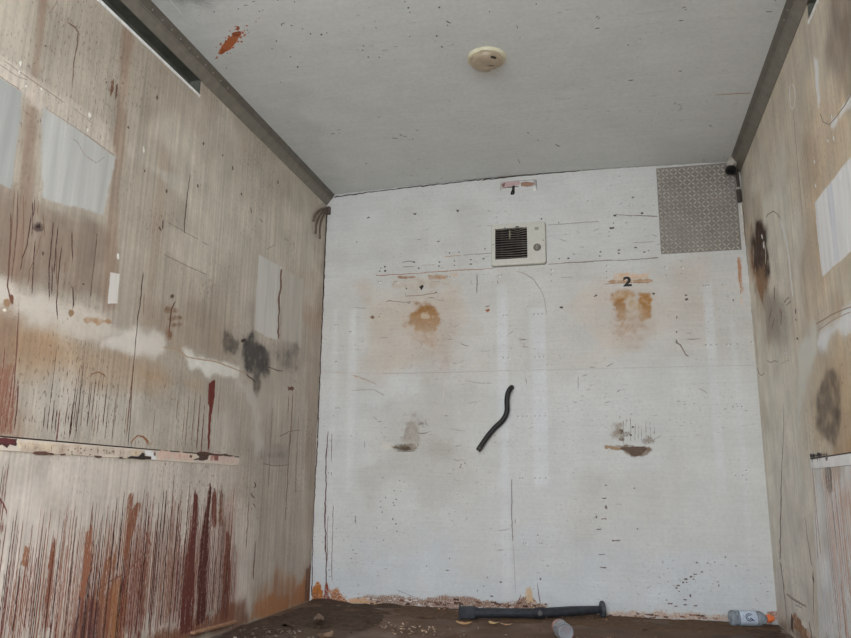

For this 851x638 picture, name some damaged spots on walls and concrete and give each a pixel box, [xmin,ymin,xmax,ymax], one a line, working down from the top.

corrosion [215,18,260,59]
corrosion [0,188,152,457]
leakage [164,294,183,341]
corrosion [370,273,461,359]
corrosion [605,272,674,364]
corrosion [176,380,220,451]
leakage [808,362,847,447]
corrosion [0,464,237,638]
corrosion [249,566,378,622]